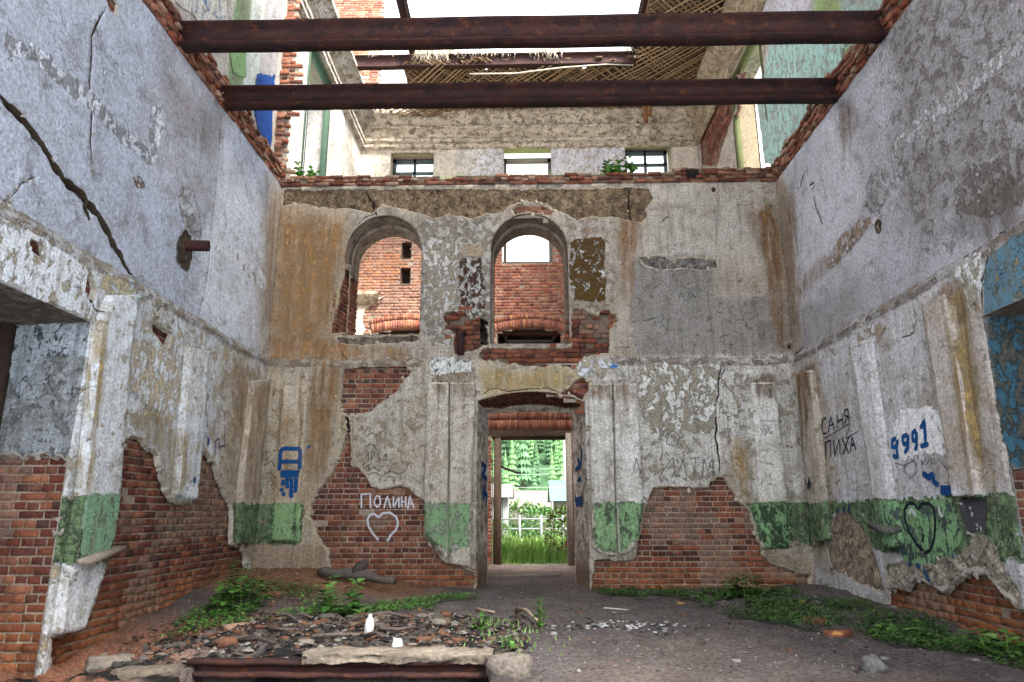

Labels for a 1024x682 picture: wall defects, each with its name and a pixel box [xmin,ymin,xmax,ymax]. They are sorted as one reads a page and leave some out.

crack [0,11,137,280]
flaking render [330,237,624,417]
peeling [638,362,720,439]
crack [714,365,726,473]
peeling [949,231,1024,544]
flaking render [0,434,249,677]
flaking render [271,432,478,589]
flaking render [590,476,812,589]
flaking render [822,497,1024,645]